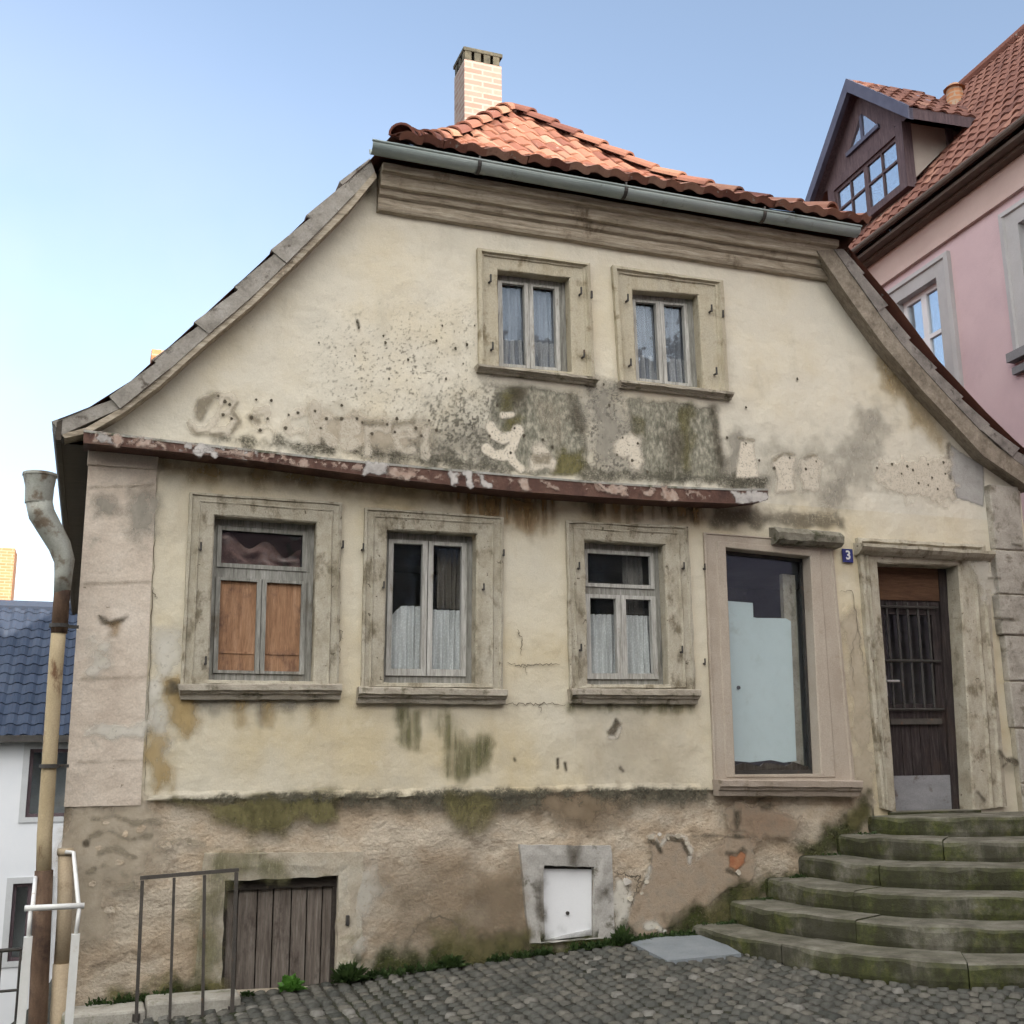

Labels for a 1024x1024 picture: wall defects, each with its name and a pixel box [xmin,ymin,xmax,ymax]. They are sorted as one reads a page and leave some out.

peeling [93,433,166,449]
peeling [184,443,309,467]
mould [273,435,335,455]
peeling [322,459,494,489]
water stain [351,390,510,474]
water stain [574,384,767,489]
crack [509,629,560,673]
water stain [164,677,208,736]
crack [506,702,566,711]
spalling [607,719,621,739]
mould [194,787,708,829]
peeling [613,799,803,936]